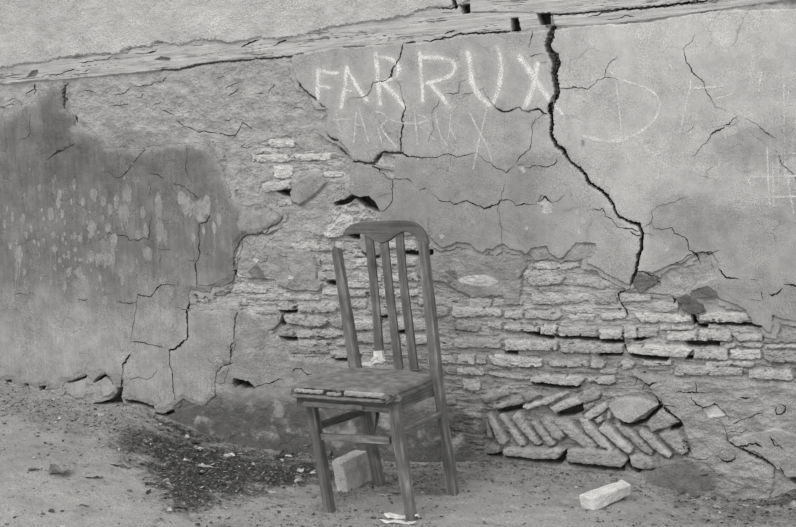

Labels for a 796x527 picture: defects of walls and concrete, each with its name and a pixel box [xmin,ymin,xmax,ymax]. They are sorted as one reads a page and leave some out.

spalling [604,14,688,25]
spalling [714,0,796,11]
crack [1,56,112,122]
crack [352,0,796,350]
crack [102,78,253,395]
spalling [0,46,430,462]
crack [196,311,239,416]
spalling [428,235,796,510]
spalling [402,396,443,463]